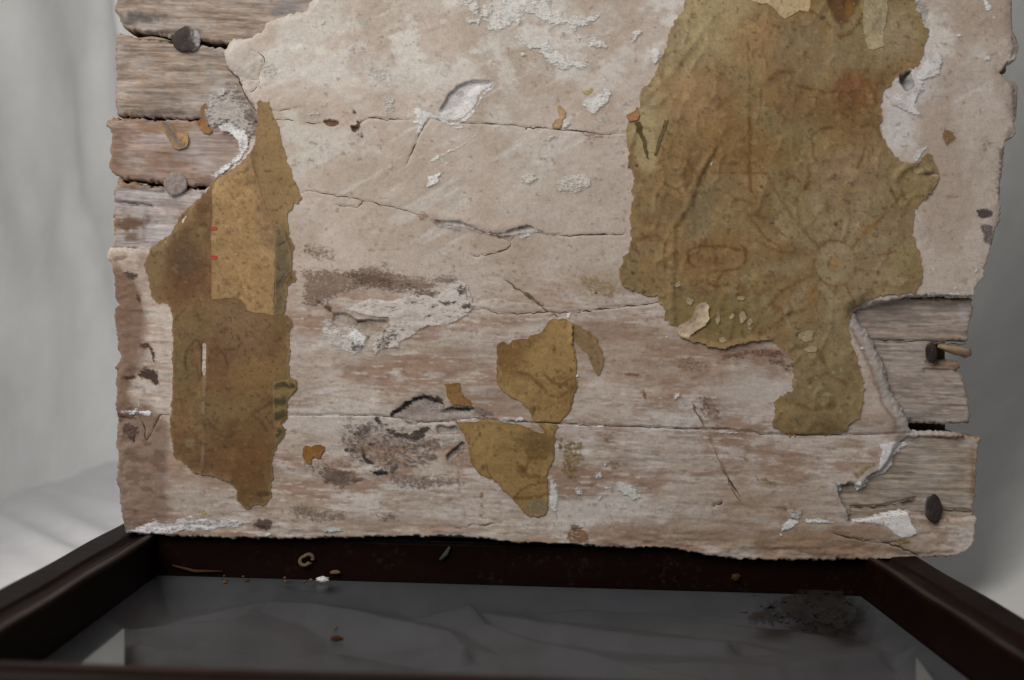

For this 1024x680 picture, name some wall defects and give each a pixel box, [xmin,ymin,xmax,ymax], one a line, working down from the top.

peeling [461,0,607,70]
spalling [198,81,263,177]
spalling [413,80,494,187]
crack [359,117,622,162]
crack [300,190,425,217]
crack [561,231,623,239]
spalling [977,208,993,245]
peeling [318,280,474,354]
damp [304,416,464,491]
spalling [390,393,523,463]
damp [290,504,344,522]
peeling [780,507,917,538]